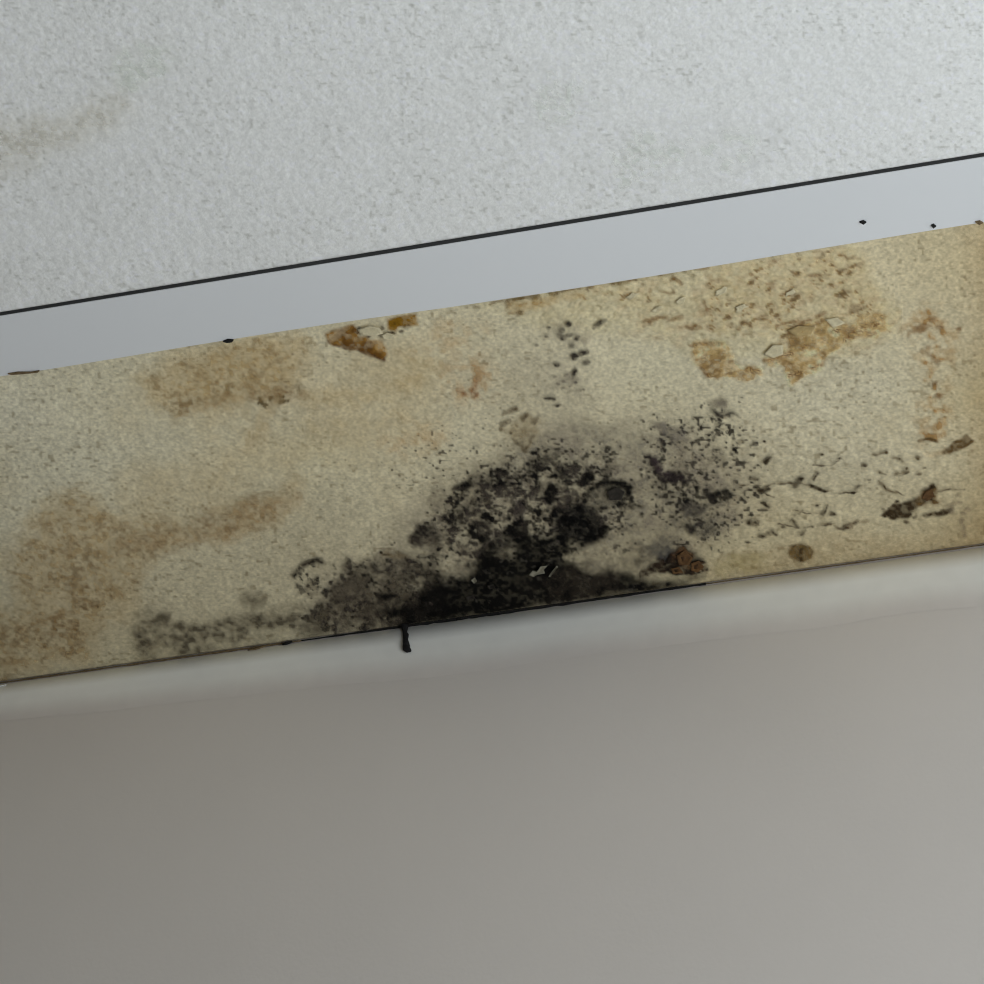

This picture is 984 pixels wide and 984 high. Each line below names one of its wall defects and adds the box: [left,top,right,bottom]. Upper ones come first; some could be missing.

damp [536,322,590,390]
peeling [693,251,889,384]
damp [0,400,984,684]